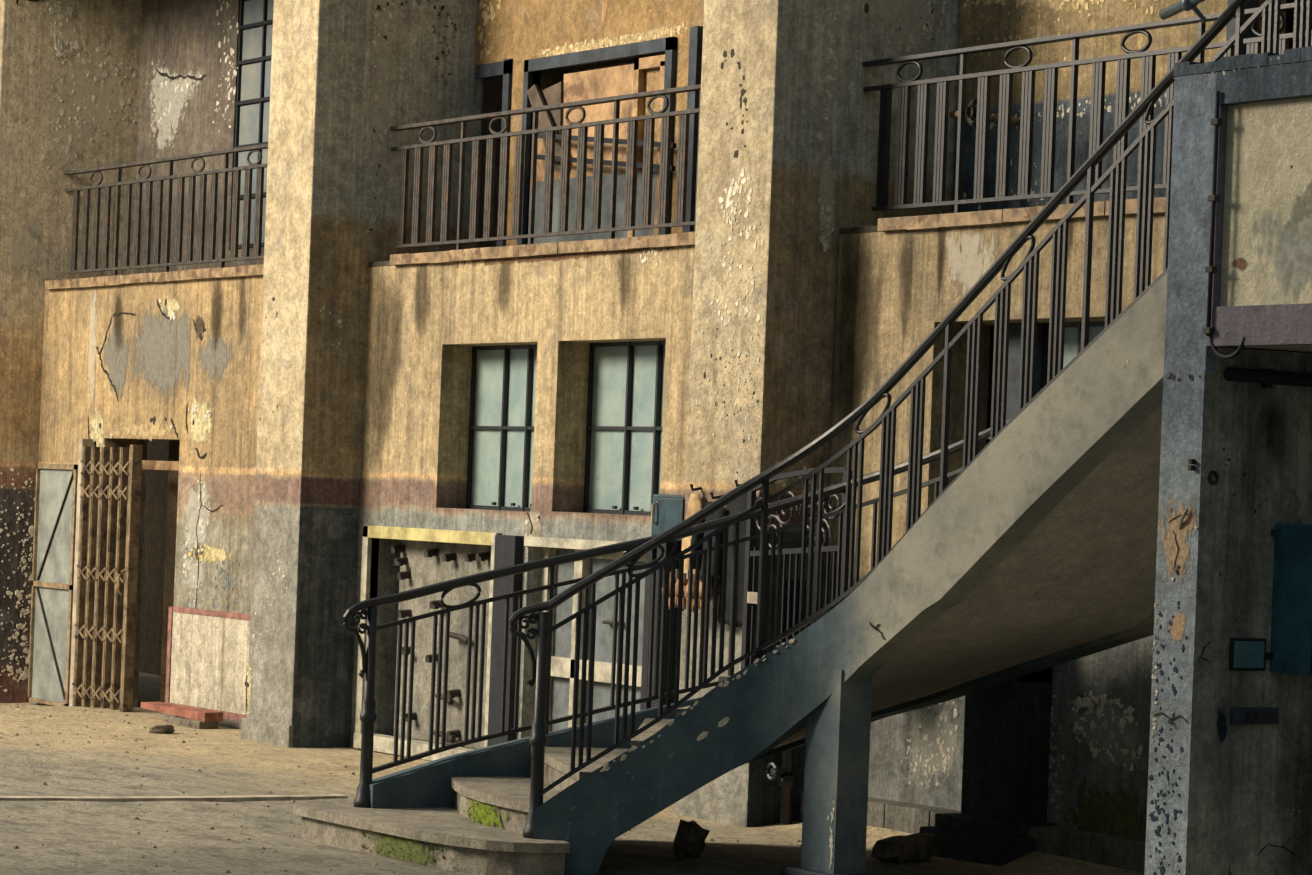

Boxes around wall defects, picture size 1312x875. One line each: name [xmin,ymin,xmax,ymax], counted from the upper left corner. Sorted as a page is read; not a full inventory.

spalling [157,297,180,321]
spalling [193,316,206,341]
leakage [416,275,427,320]
leakage [500,266,508,299]
leakage [841,266,870,406]
leakage [938,233,994,294]
crack [195,471,223,609]
spalling [1159,496,1199,583]
peeling [0,468,35,692]
peeling [718,639,795,687]
peeling [697,717,730,741]
peeling [1047,600,1187,875]